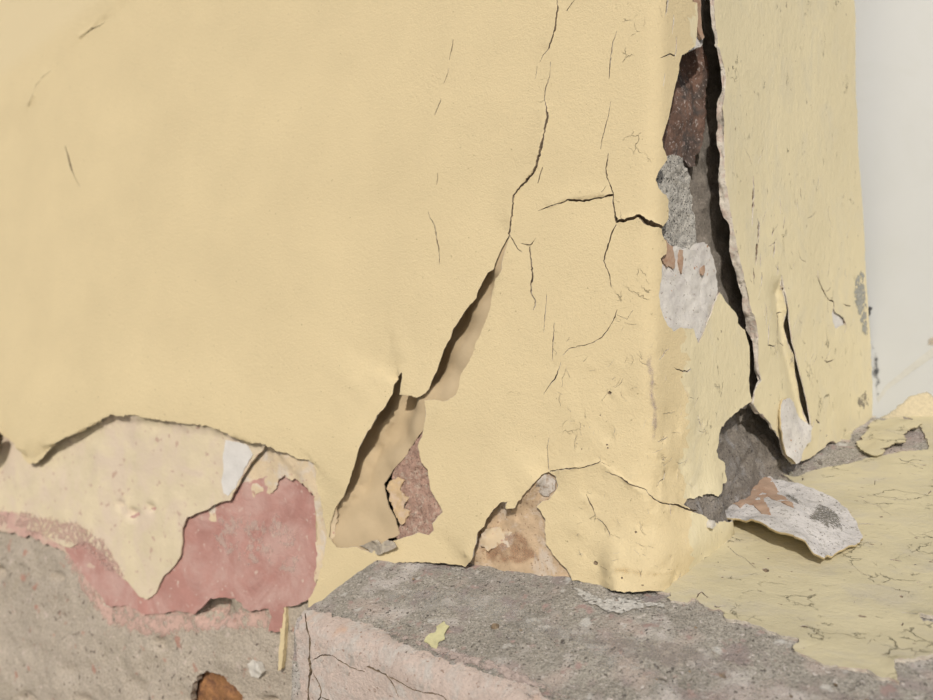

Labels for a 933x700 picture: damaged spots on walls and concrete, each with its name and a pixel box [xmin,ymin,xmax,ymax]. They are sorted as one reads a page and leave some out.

crack [508,1,632,406]
crack [541,0,792,409]
spalling [0,231,571,700]
crack [305,614,447,700]
peeling [574,588,665,614]
crack [547,422,697,512]
spalling [684,293,812,529]
spalling [810,504,842,529]